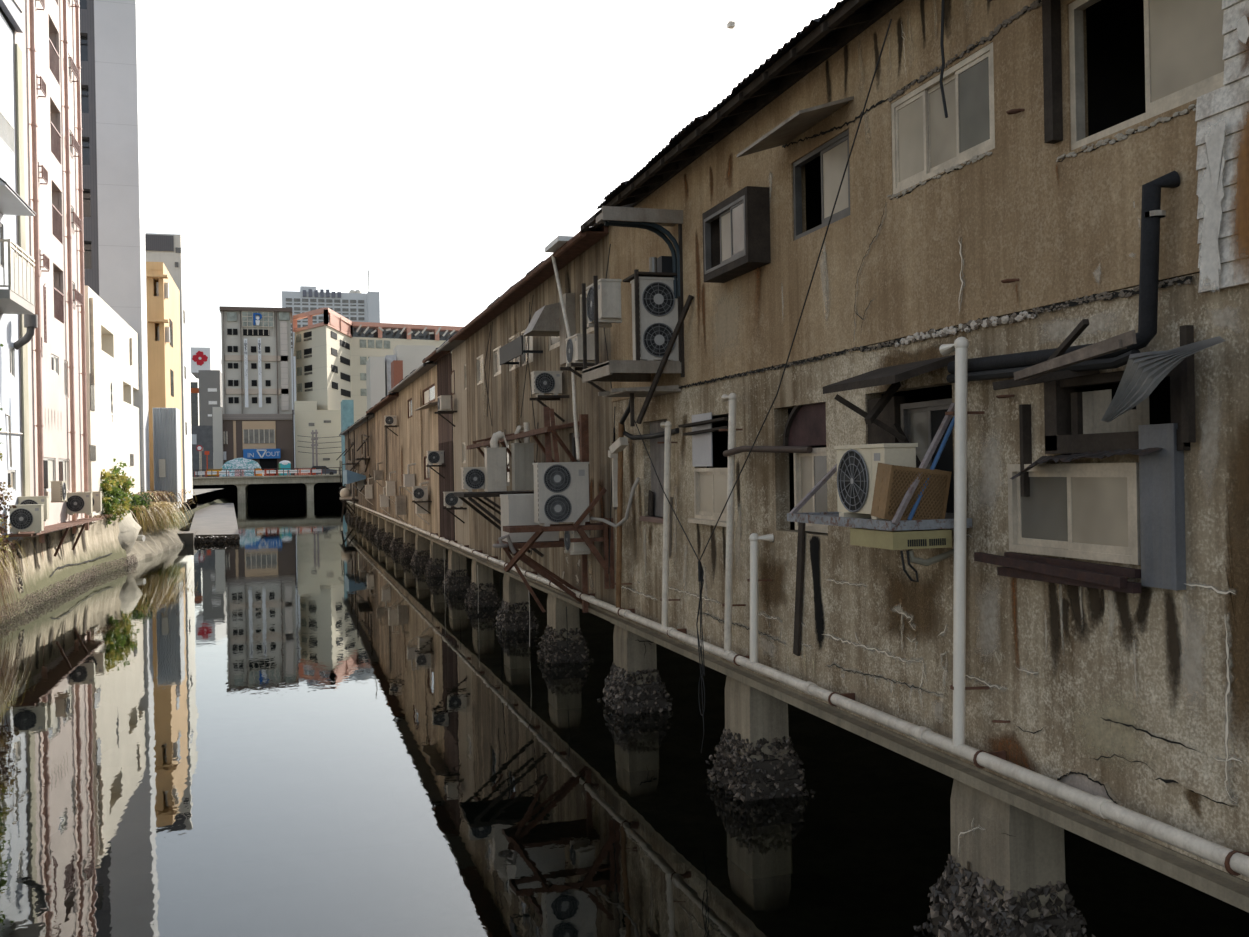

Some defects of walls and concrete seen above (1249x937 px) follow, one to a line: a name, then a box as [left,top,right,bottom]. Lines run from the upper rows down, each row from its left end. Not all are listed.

damp [826,0,951,102]
peeling [1237,15,1249,44]
peeling [1197,120,1226,290]
rust [1232,103,1249,269]
damp [1045,582,1202,697]
crack [1093,582,1242,803]